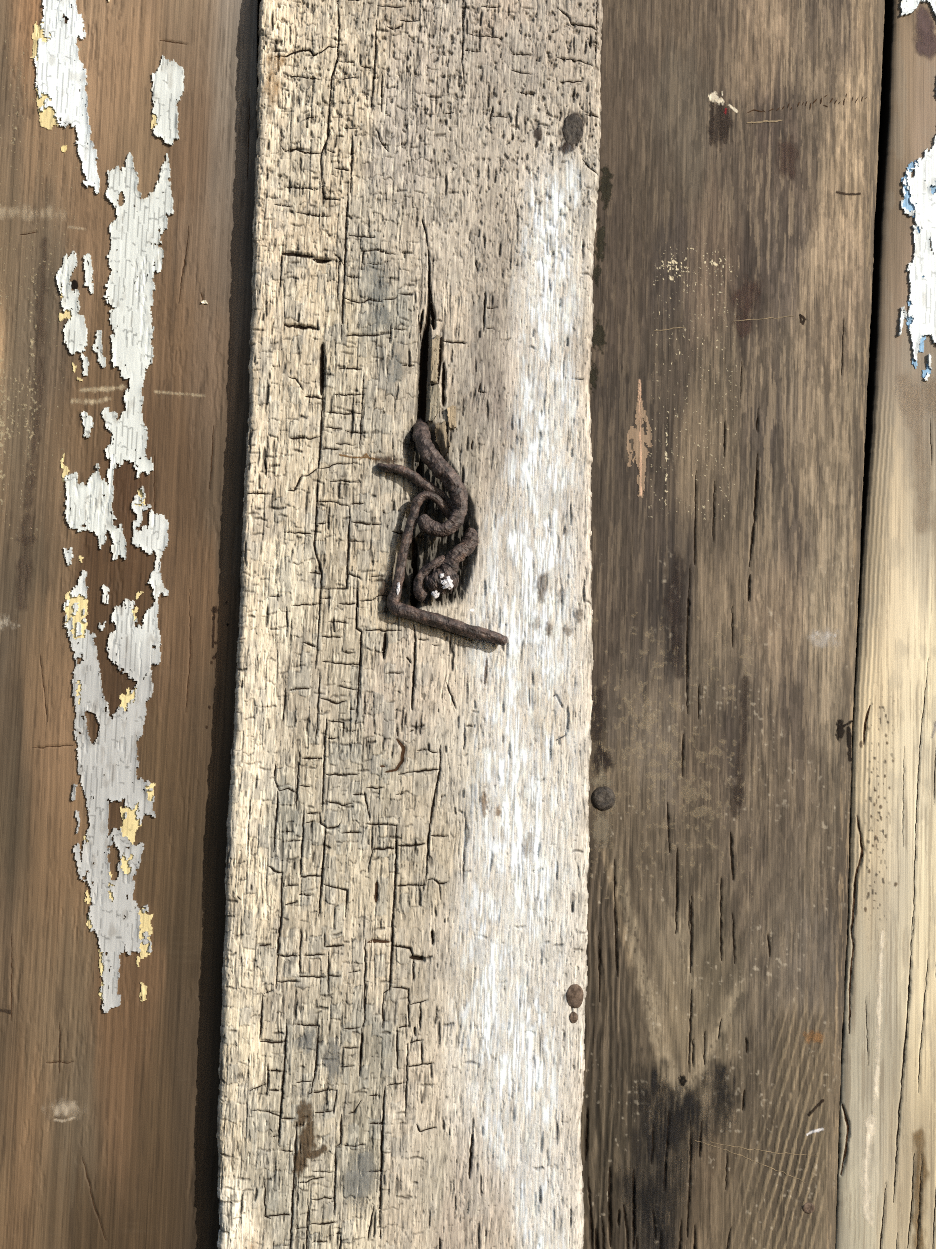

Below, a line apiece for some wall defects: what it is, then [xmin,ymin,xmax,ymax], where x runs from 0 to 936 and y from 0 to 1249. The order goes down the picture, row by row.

crack [445,0,598,120]
peeling [900,0,936,17]
crack [244,98,252,177]
peeling [898,136,936,381]
peeling [30,0,185,1013]
crack [247,0,493,1249]
corrosion [379,577,393,613]